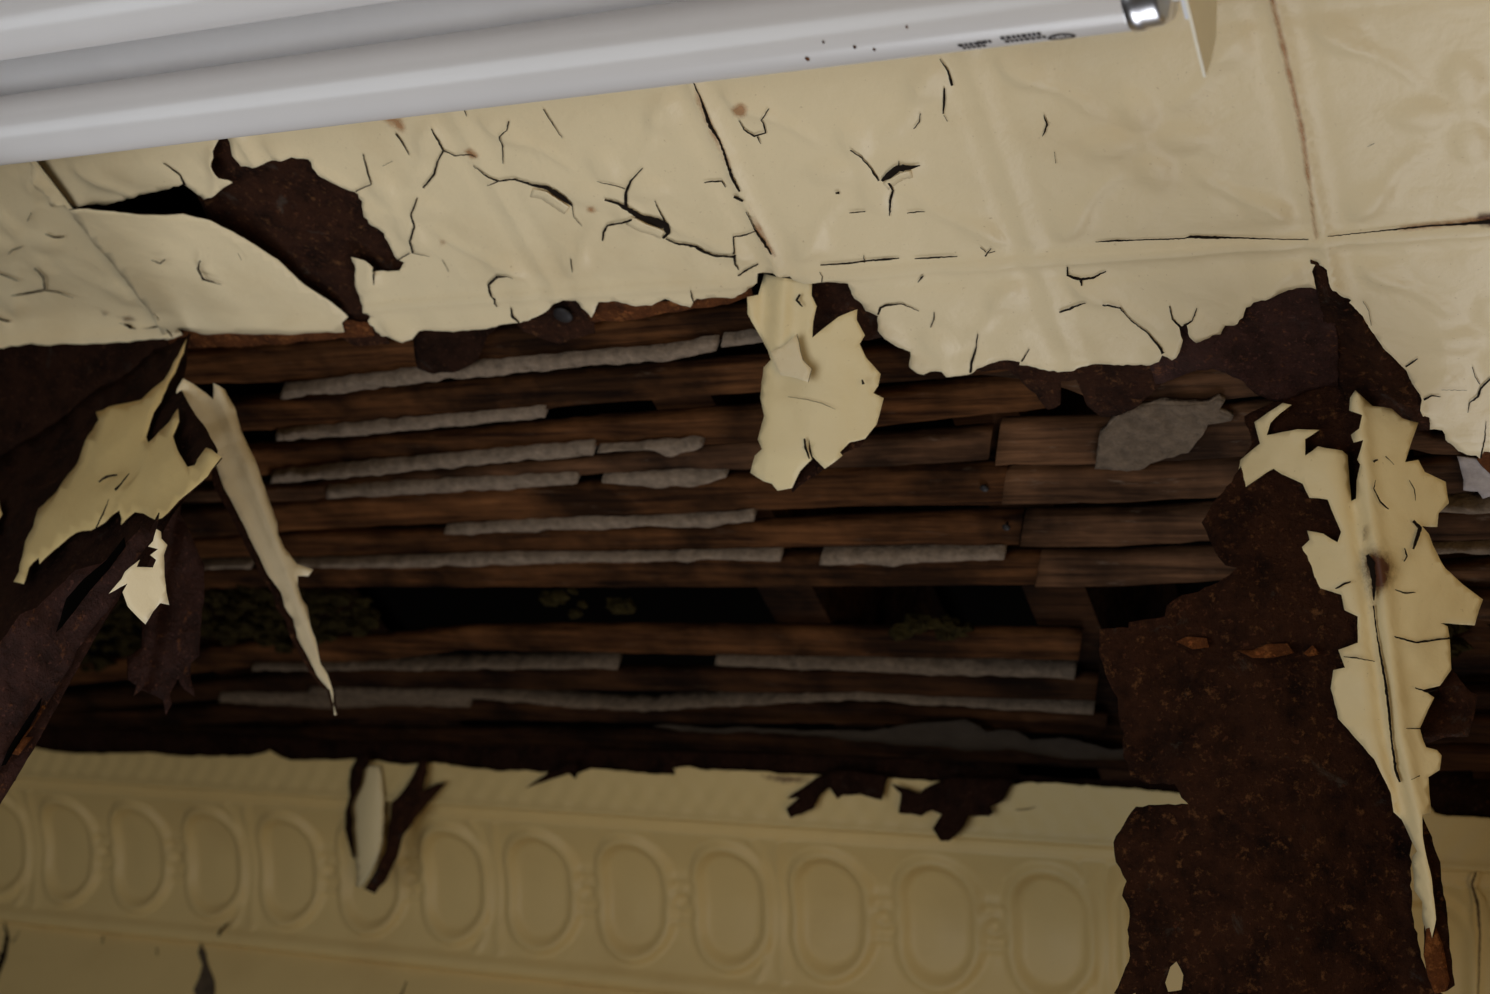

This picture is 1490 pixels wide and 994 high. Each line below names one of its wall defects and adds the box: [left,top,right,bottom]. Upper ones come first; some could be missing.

crack [913,59,953,129]
peeling [530,188,570,214]
crack [356,83,772,285]
peeling [626,217,665,239]
crack [835,150,924,216]
crack [487,276,520,323]
crack [795,247,995,327]
crack [1059,220,1490,355]
peeling [770,334,812,382]
peeling [1457,455,1490,498]
peeling [109,529,169,624]
rust [1365,553,1391,591]